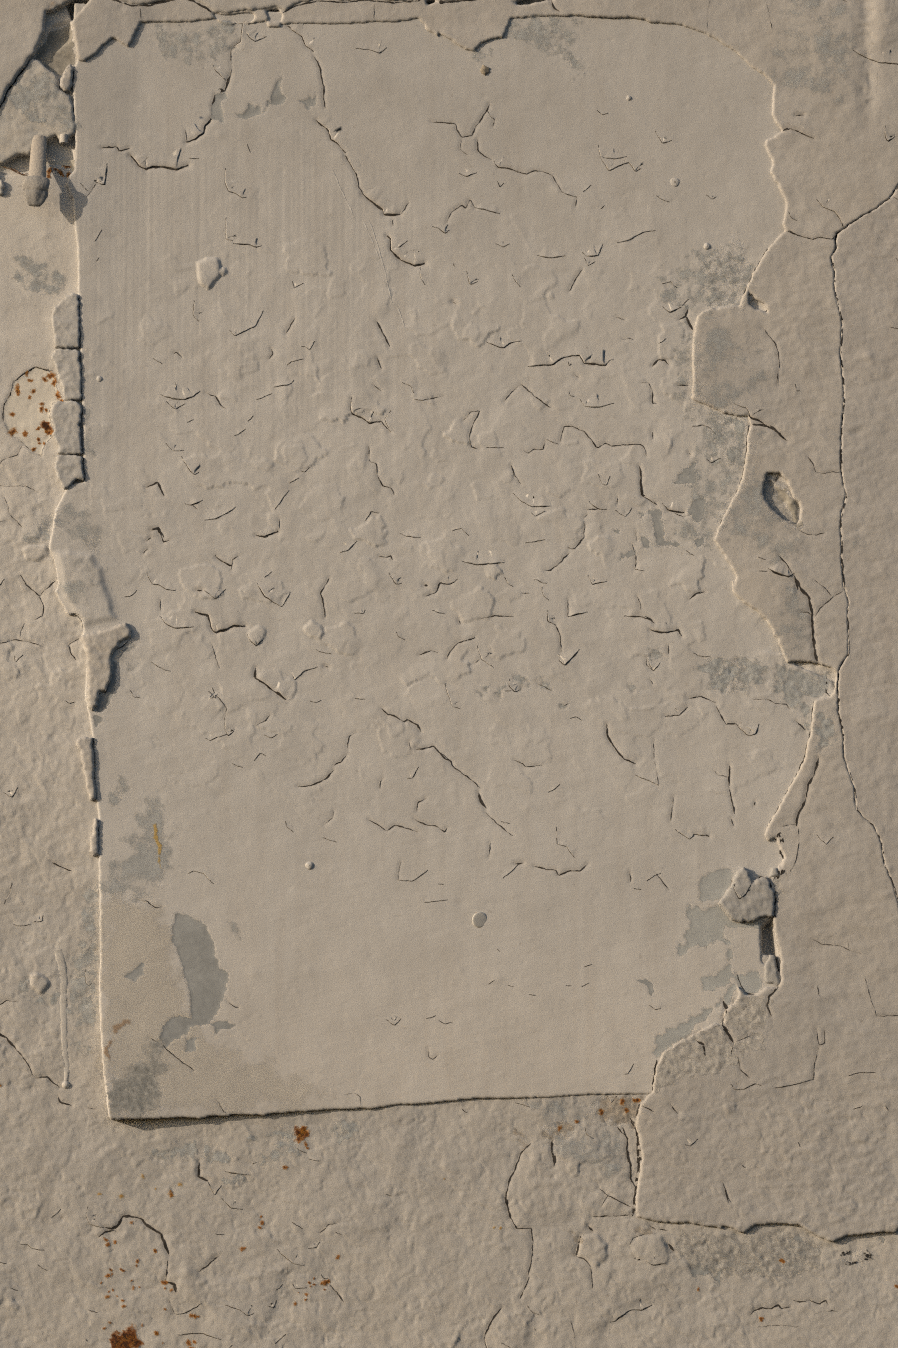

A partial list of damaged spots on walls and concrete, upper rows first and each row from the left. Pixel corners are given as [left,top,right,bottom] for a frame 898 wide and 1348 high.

crack [113,0,211,17]
crack [102,21,253,171]
crack [283,0,474,285]
peeling [4,368,63,455]
rust [8,371,63,451]
peeling [451,410,745,665]
crack [606,186,898,917]
peeling [65,623,141,805]
peeling [18,800,238,1119]
spalling [542,868,774,1139]
rust [294,1126,309,1149]
rust [103,1322,163,1348]